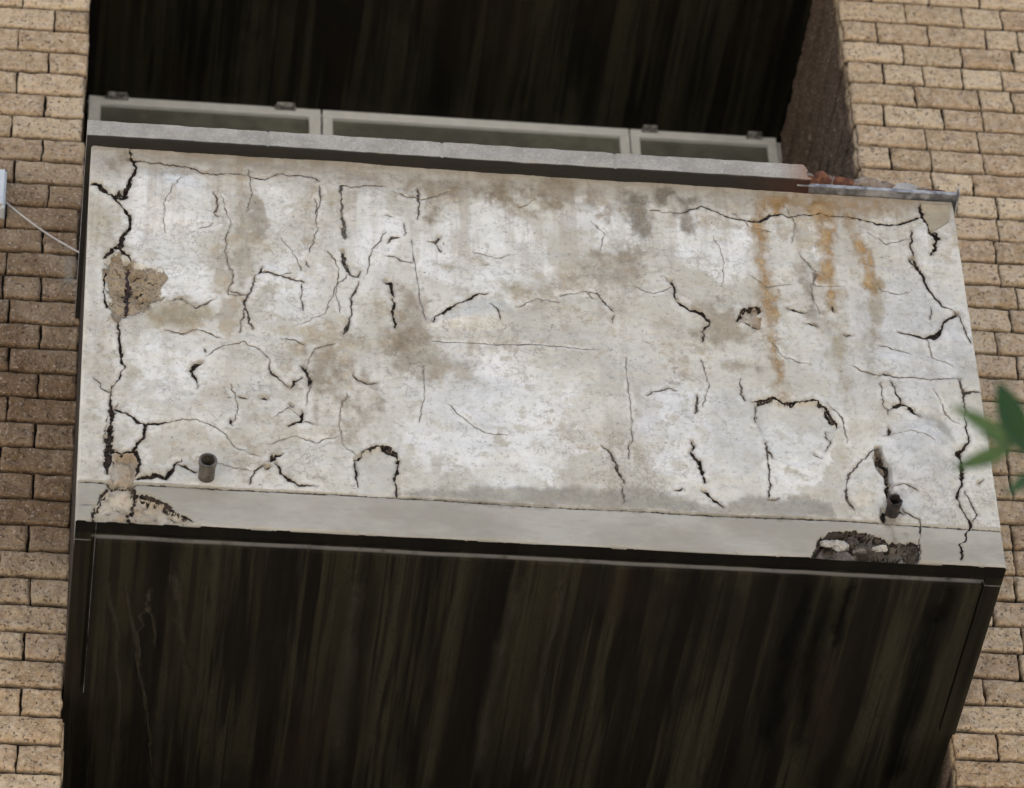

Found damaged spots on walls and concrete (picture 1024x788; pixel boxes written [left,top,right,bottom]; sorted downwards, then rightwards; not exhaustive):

water stain [629,189,694,236]
spalling [102,252,168,323]
corrosion [755,258,779,321]
corrosion [809,201,835,312]
corrosion [854,239,877,294]
crack [80,151,1000,560]
spalling [91,453,193,525]
spalling [811,530,921,564]